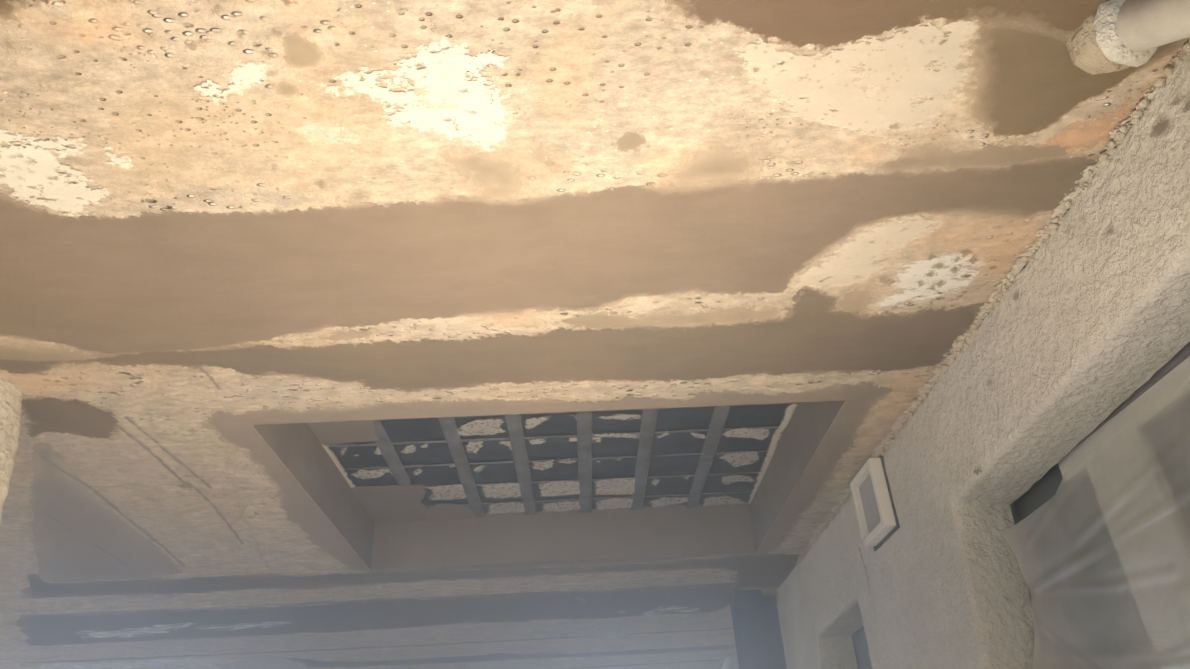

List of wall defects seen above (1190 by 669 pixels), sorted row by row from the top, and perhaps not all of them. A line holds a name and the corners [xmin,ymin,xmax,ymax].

spalling [41,0,516,153]
peeling [0,129,346,219]
peeling [215,19,1190,571]
crack [115,417,244,544]
peeling [74,621,292,638]
spalling [30,568,734,615]